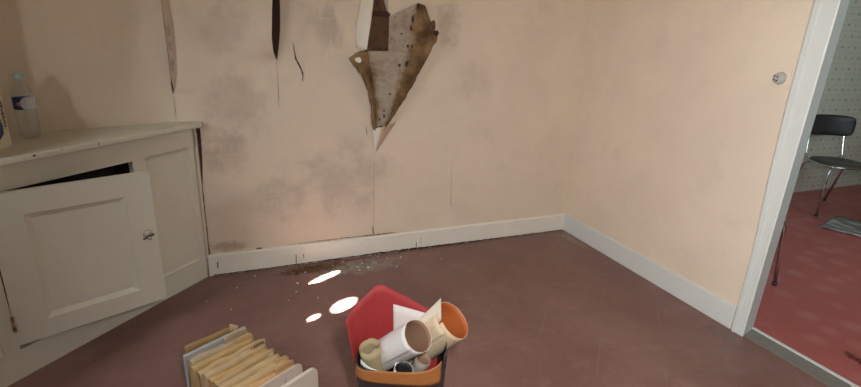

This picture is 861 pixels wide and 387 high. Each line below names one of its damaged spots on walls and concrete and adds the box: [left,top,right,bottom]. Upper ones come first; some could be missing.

crack [161,0,172,81]
crack [196,128,562,276]